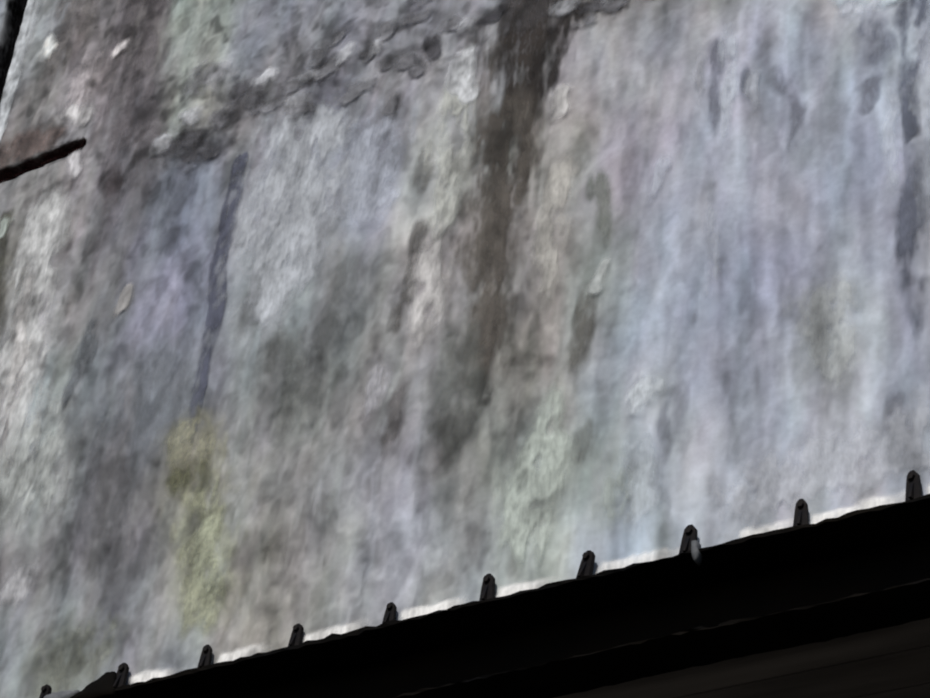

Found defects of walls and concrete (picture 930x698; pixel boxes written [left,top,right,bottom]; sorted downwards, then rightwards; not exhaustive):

water stain [837,0,930,160]
rust [0,127,64,168]
water stain [392,0,589,404]
water stain [587,173,610,236]
water stain [890,154,930,258]
water stain [569,259,609,368]
water stain [365,366,405,445]
water stain [628,376,664,413]
water stain [502,393,590,561]
water stain [603,438,656,517]